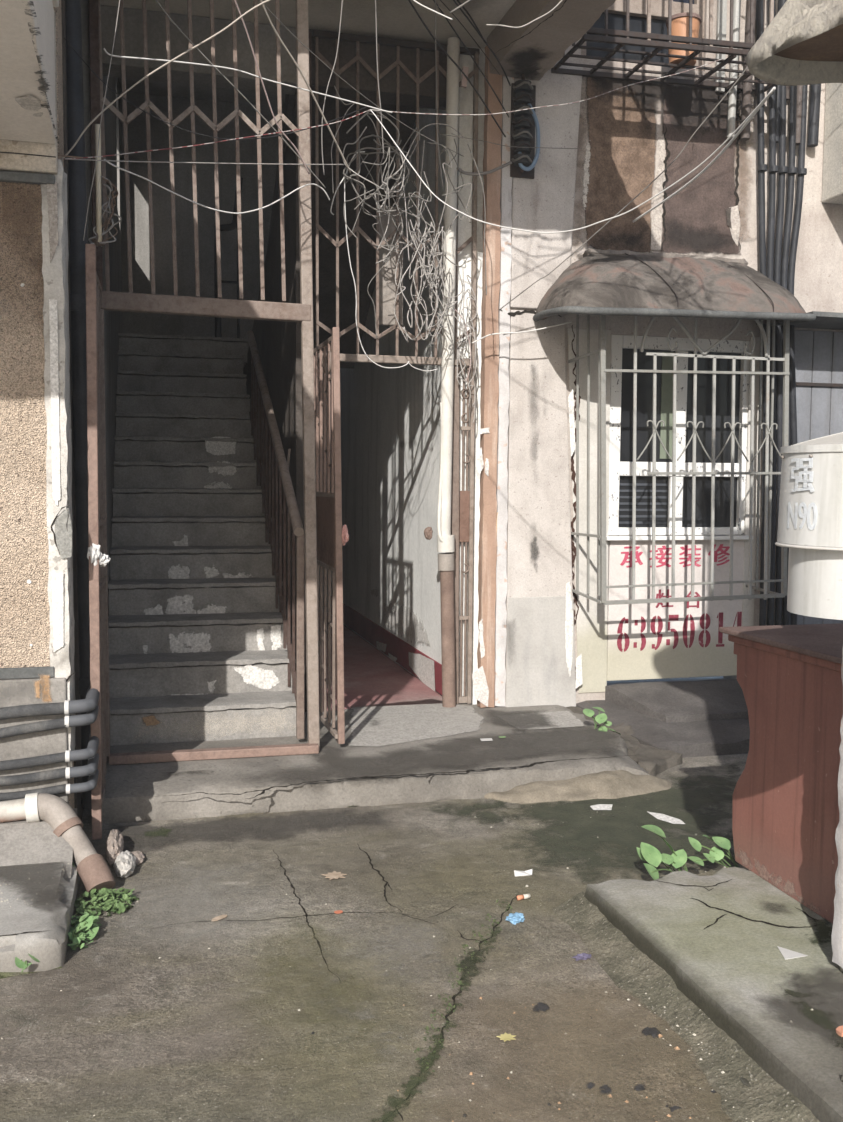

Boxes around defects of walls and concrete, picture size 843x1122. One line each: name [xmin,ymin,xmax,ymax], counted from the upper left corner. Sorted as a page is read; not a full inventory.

peeling [204,436,237,489]
crack [499,309,581,625]
peeling [167,564,190,579]
peeling [204,565,253,578]
peeling [143,594,227,615]
peeling [169,631,212,653]
peeling [256,625,283,650]
peeling [233,664,280,690]
crack [155,755,635,799]
crack [147,845,517,980]
crack [656,879,818,929]
crack [382,977,465,1122]